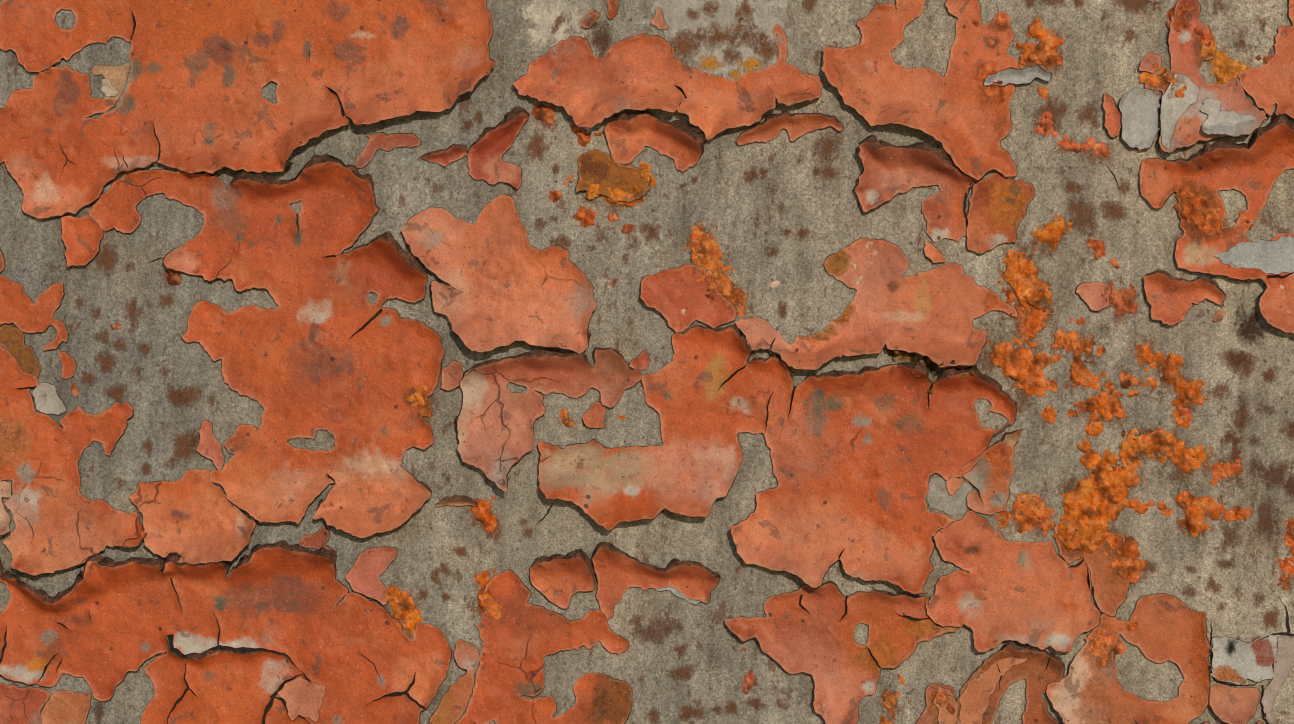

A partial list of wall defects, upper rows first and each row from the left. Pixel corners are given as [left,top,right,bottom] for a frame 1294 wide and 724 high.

rust [1015,0,1083,71]
rust [1118,0,1273,87]
rust [536,125,667,261]
peeling [512,0,1052,255]
rust [1034,86,1110,163]
peeling [1102,0,1294,334]
rust [682,211,747,316]
peeling [0,0,597,724]
rust [979,182,1294,609]
peeling [428,238,1294,724]
crack [168,617,311,724]
crack [356,651,425,709]